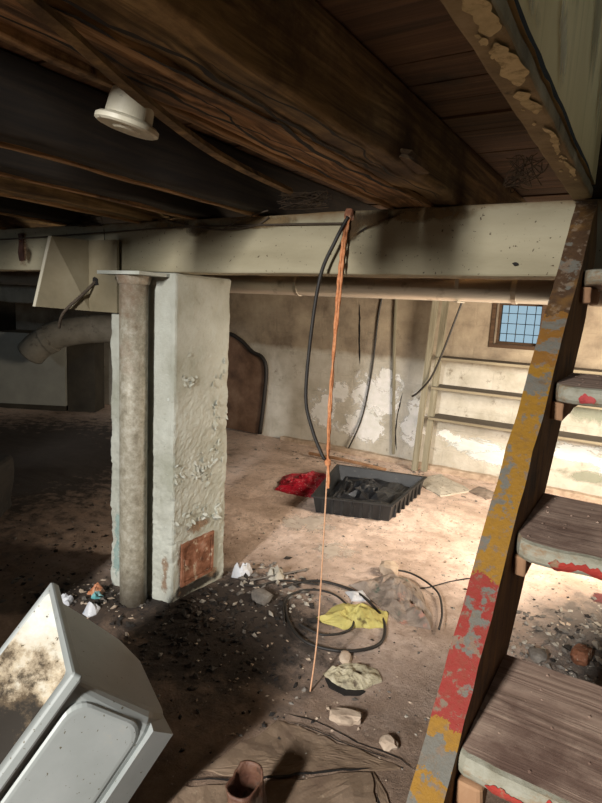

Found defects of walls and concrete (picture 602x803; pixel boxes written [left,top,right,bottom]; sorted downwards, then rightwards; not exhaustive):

peeling [462,0,577,181]
water stain [436,429,505,466]
water stain [554,442,602,483]
peeling [175,502,223,534]